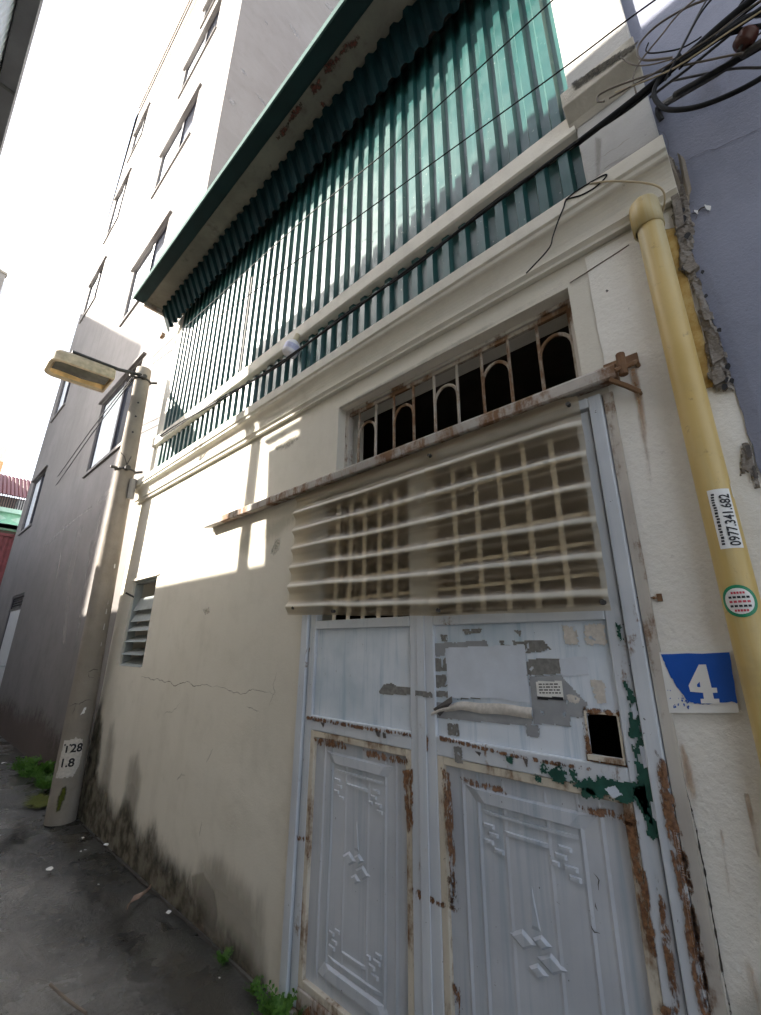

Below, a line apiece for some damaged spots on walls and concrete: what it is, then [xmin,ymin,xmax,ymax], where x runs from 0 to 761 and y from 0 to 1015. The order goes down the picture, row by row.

flaking render [668,153,735,392]
damp [77,707,256,980]
corrosion [314,738,346,750]
corrosion [307,716,411,737]
corrosion [363,749,413,832]
corrosion [412,768,507,913]
corrosion [426,729,628,771]
peeling [505,681,659,841]
corrosion [578,805,680,1015]
corrosion [655,751,712,1015]